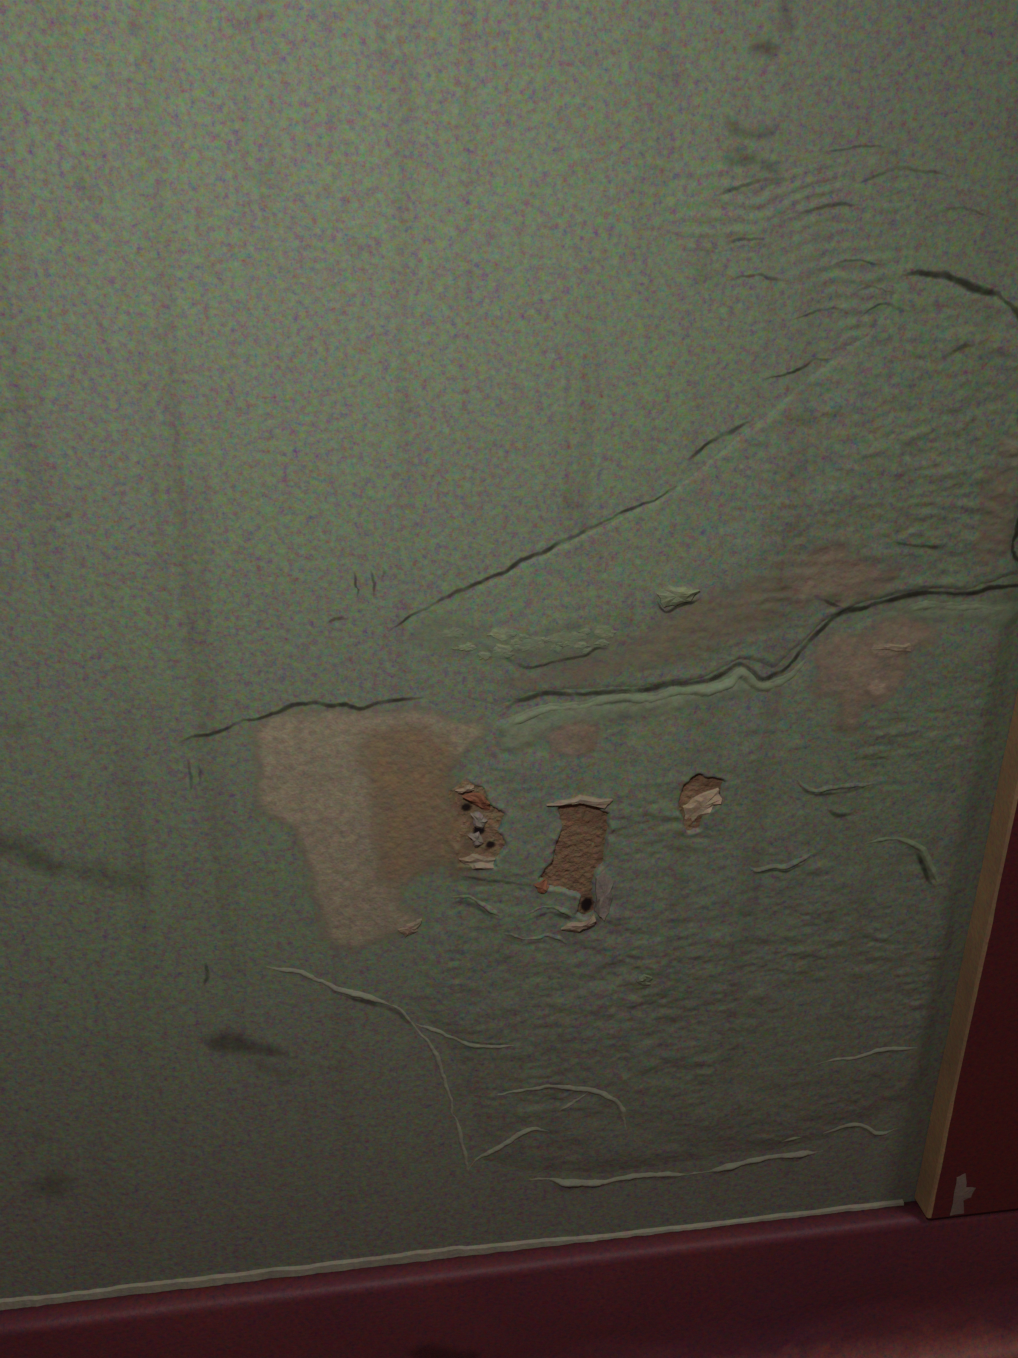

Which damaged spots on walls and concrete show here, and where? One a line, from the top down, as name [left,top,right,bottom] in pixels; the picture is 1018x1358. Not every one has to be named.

crack [912,270,1018,317]
crack [455,544,555,593]
crack [499,519,1018,749]
crack [200,698,406,736]
peeling [255,710,505,948]
spalling [679,774,722,830]
spalling [534,795,614,933]
peeling [950,1173,976,1216]